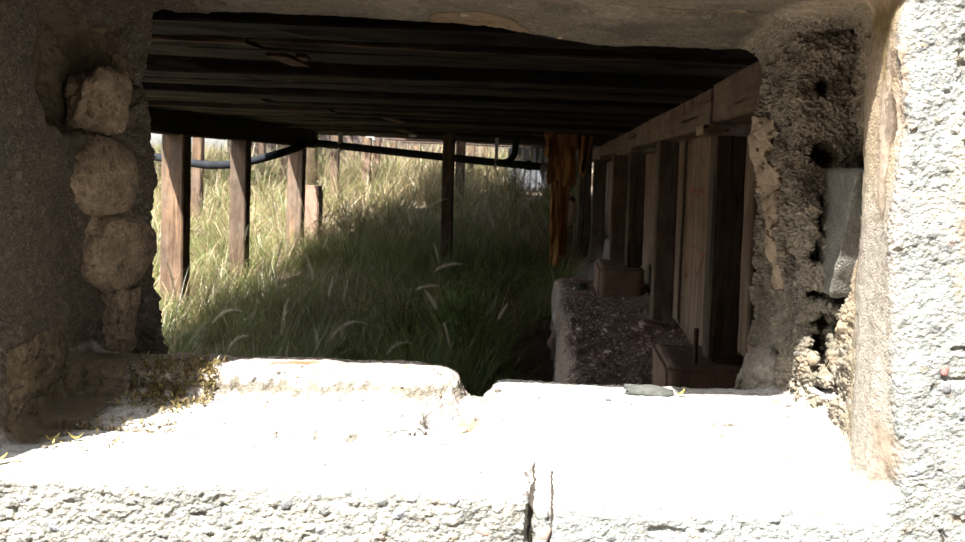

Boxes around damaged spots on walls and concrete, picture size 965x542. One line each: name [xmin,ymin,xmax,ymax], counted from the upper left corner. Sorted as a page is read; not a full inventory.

flaking render [748,115,784,292]
flaking render [797,217,861,375]
crack [528,462,554,542]